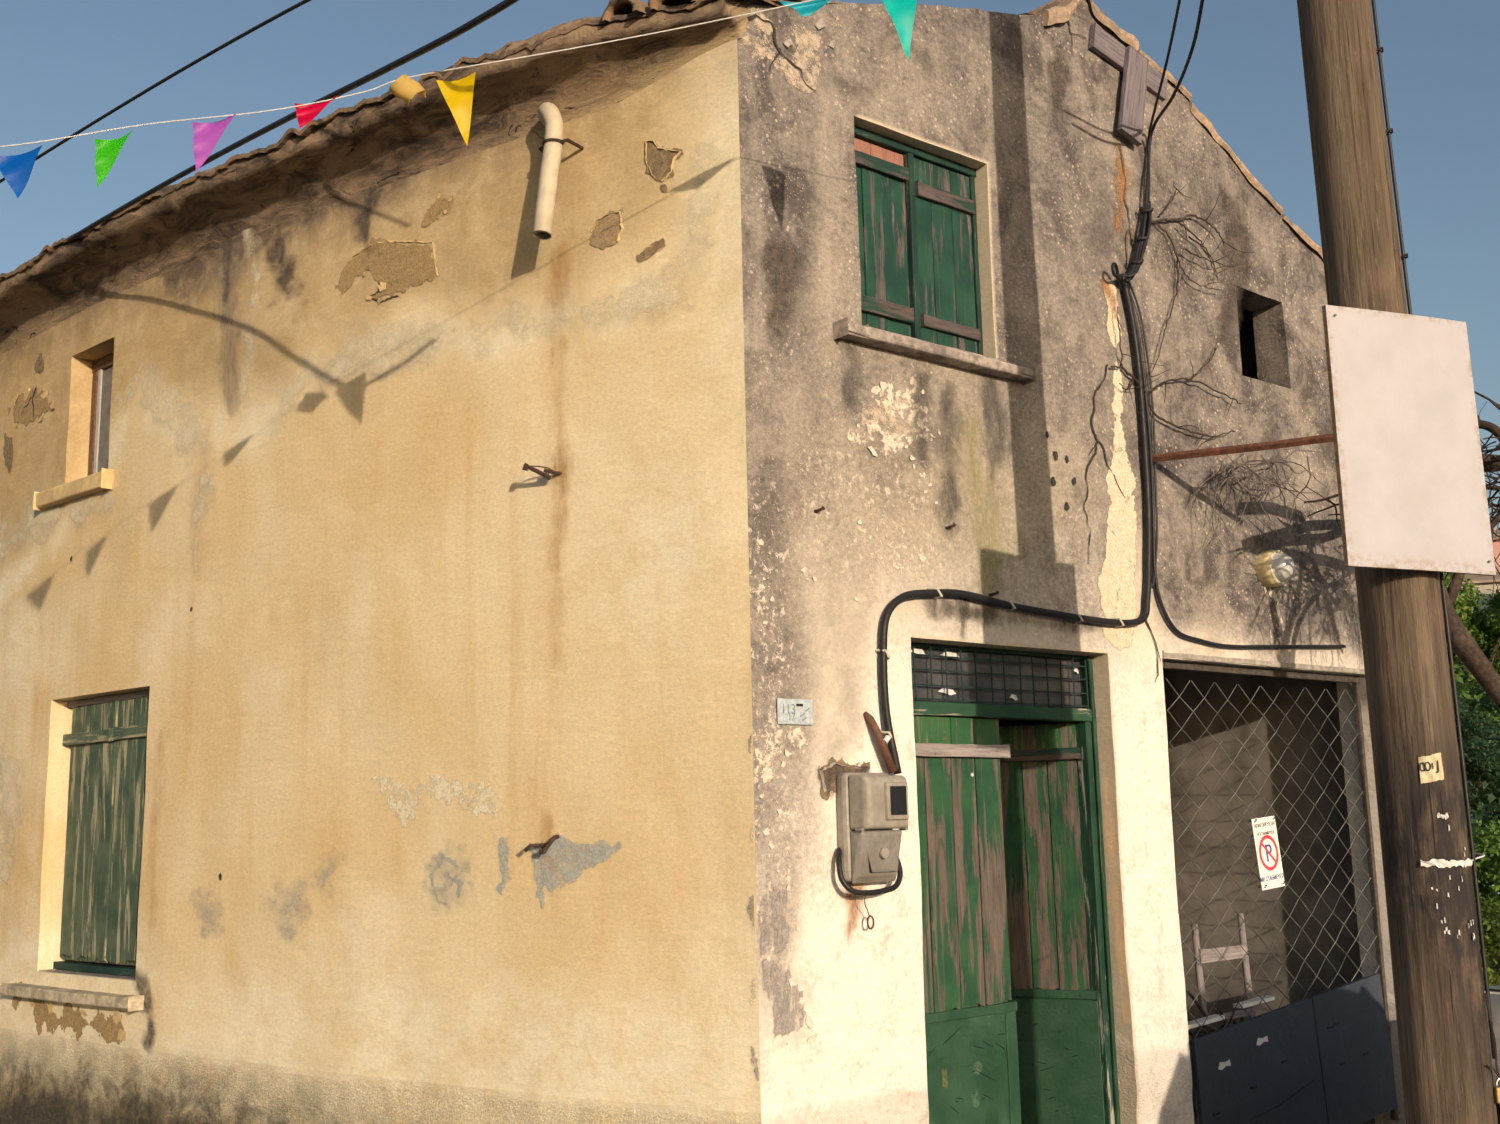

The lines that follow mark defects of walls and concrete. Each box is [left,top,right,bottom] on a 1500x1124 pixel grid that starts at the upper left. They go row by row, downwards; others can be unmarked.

crack [747,14,817,92]
leakage [220,228,294,324]
leakage [356,186,376,240]
flaking render [335,193,453,304]
flaking render [590,210,624,249]
flaking render [636,238,665,262]
flaking render [644,140,683,192]
leakage [766,242,802,333]
rust [1115,159,1128,228]
peeling [847,376,941,504]
crack [1084,364,1125,561]
flaking render [12,982,126,1044]